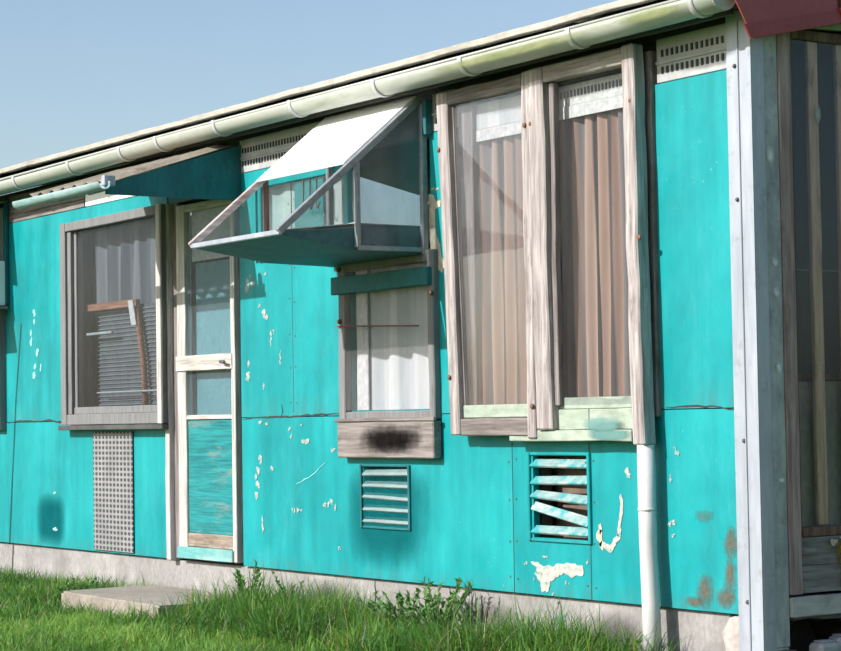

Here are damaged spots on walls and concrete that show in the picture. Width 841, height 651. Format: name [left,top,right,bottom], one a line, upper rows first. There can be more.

peeling [428,188,444,273]
peeling [30,309,42,379]
crack [9,417,61,425]
crack [668,403,734,411]
peeling [255,455,274,500]
damp [41,502,61,538]
peeling [596,494,624,553]
corrosion [727,531,737,554]
peeling [524,555,589,601]
corrosion [689,564,733,606]